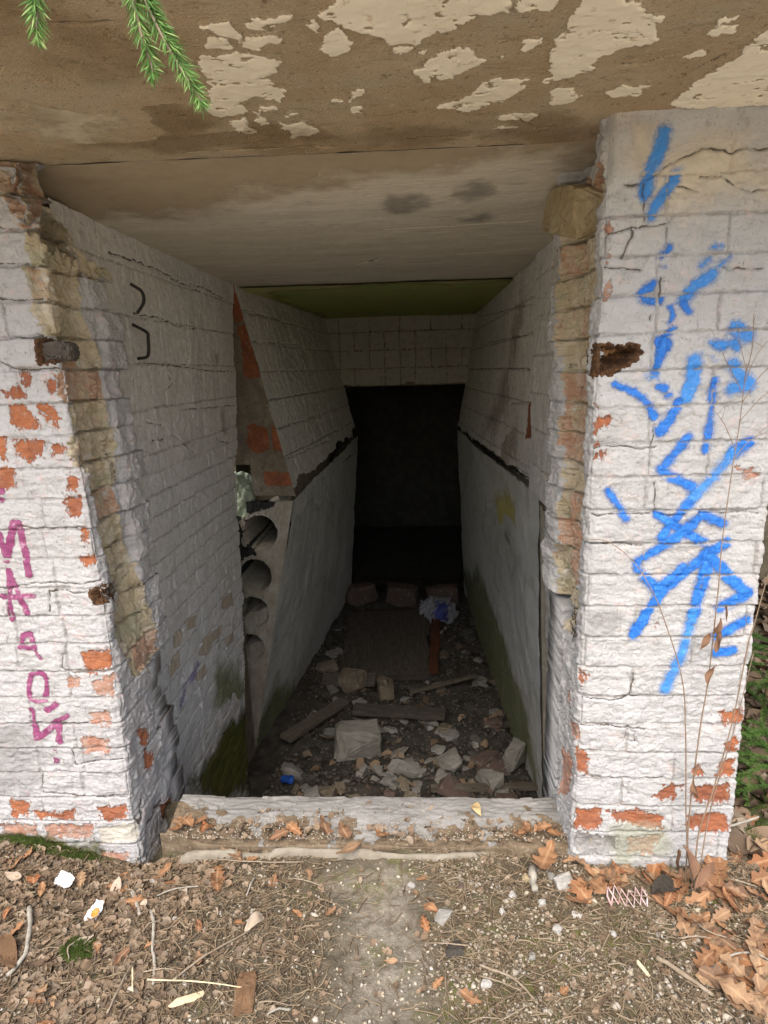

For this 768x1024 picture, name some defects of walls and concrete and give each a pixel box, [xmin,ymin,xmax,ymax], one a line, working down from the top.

peeling [198,14,320,139]
peeling [305,0,559,84]
peeling [436,0,665,130]
peeling [668,30,768,109]
leakage [37,147,498,218]
crack [604,147,768,320]
spalling [0,161,159,697]
crack [283,428,355,462]
spalling [551,161,644,632]
peeling [0,797,140,860]
peeling [572,806,665,856]
peeling [652,707,744,834]